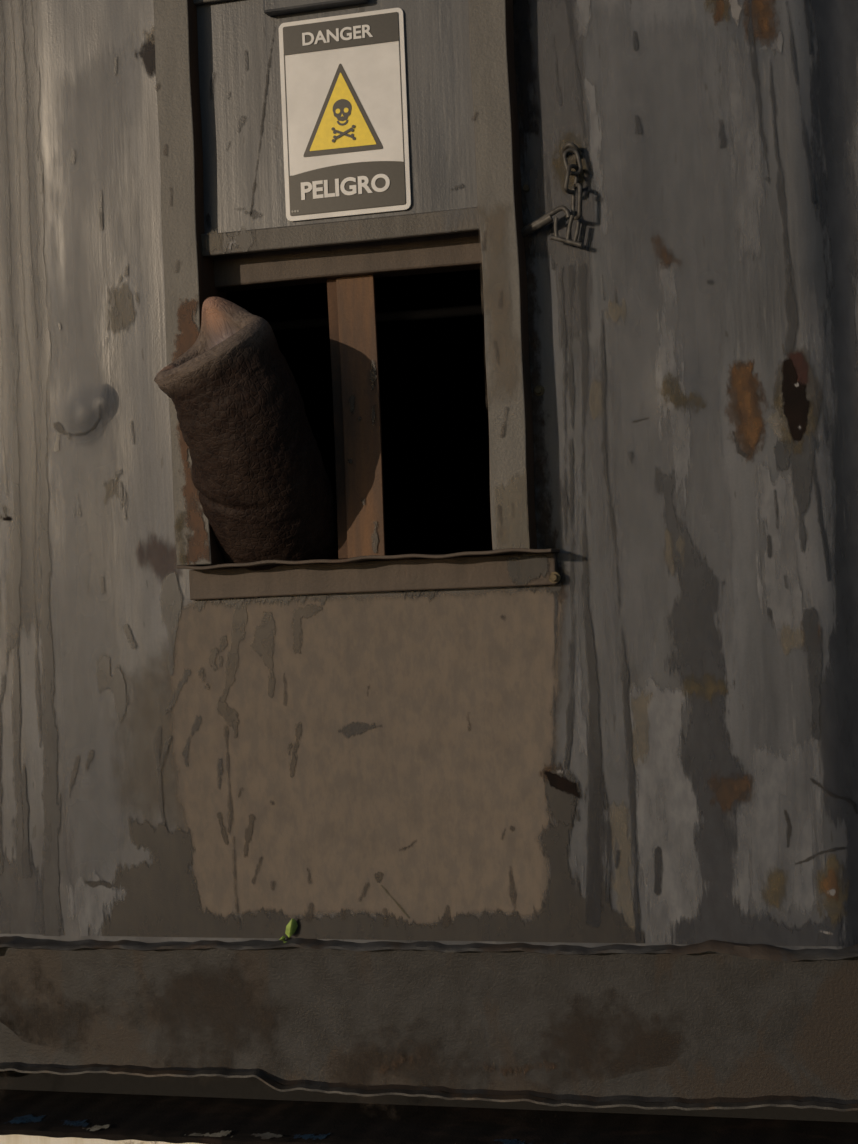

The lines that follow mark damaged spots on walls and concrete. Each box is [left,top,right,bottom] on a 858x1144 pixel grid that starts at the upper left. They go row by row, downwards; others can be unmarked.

rust [705,0,783,53]
rust [138,421,210,580]
rust [172,299,199,362]
peeling [655,262,692,509]
rust [727,361,766,459]
peeling [756,464,806,650]
peeling [802,306,845,557]
peeling [568,644,588,757]
peeling [68,871,127,936]
peeling [602,677,706,944]
peeling [730,738,824,916]